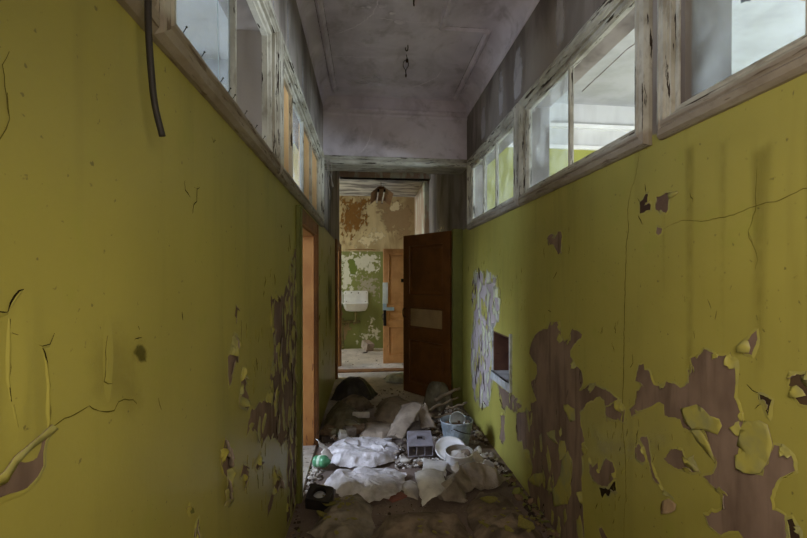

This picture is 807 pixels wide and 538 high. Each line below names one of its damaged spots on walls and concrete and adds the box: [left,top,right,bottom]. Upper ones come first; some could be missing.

crack [0,51,10,139]
flaking render [341,199,413,303]
peeling [639,190,678,215]
crack [664,172,807,268]
crack [0,289,24,427]
crack [36,333,137,428]
peeling [220,246,298,529]
peeling [354,317,380,344]
peeling [471,266,803,538]
peeling [786,371,807,408]
peeling [0,424,58,504]